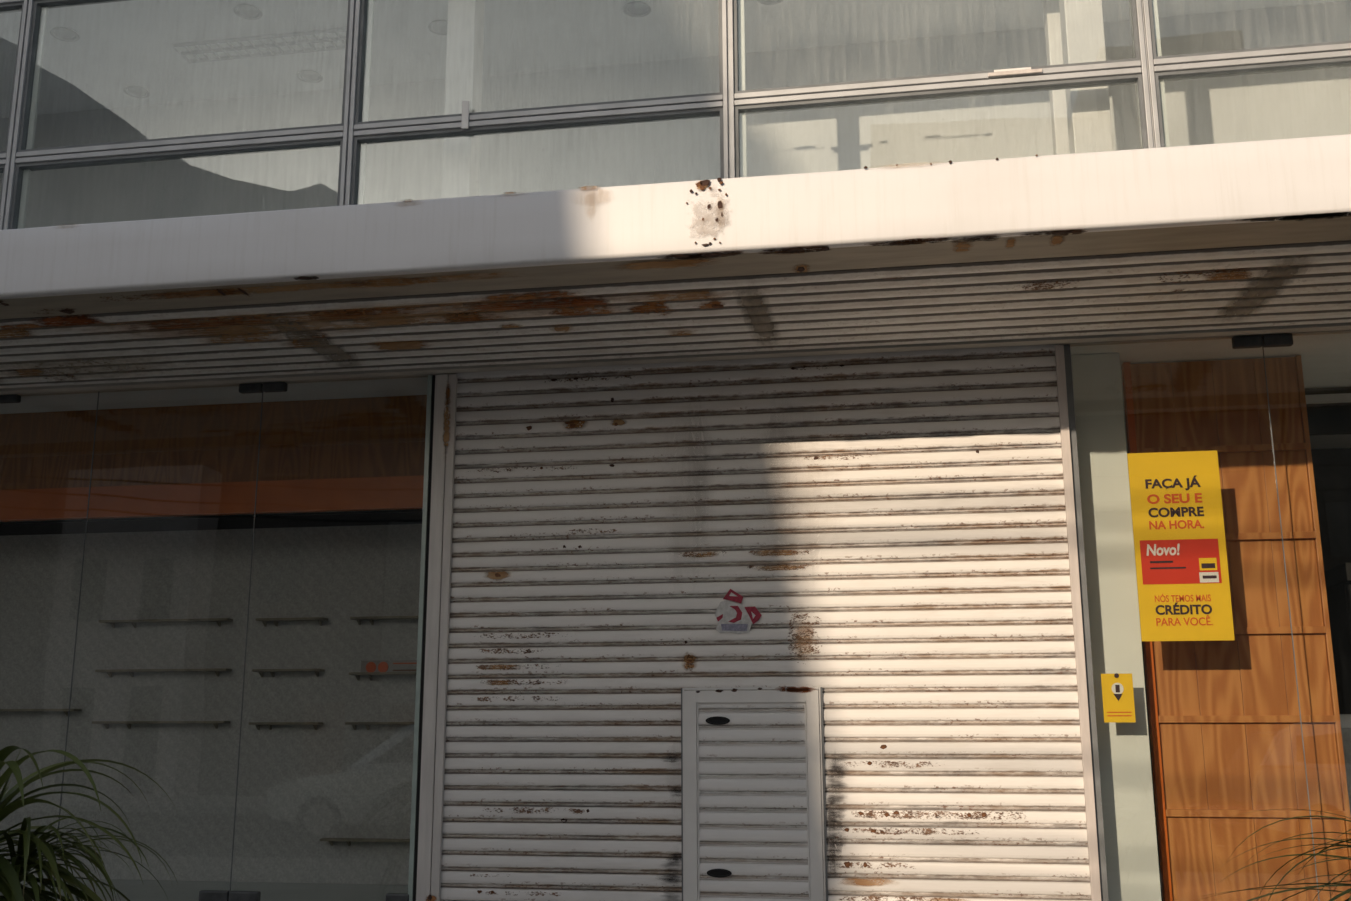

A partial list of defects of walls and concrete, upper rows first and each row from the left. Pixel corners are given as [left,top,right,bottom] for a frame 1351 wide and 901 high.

corrosion [864,229,1087,252]
corrosion [625,246,830,272]
corrosion [101,273,498,302]
corrosion [1159,267,1260,293]
corrosion [629,290,724,315]
corrosion [0,296,611,350]
corrosion [788,613,820,664]
corrosion [477,632,562,702]
corrosion [844,745,940,768]
corrosion [843,810,1023,835]
corrosion [839,861,959,901]